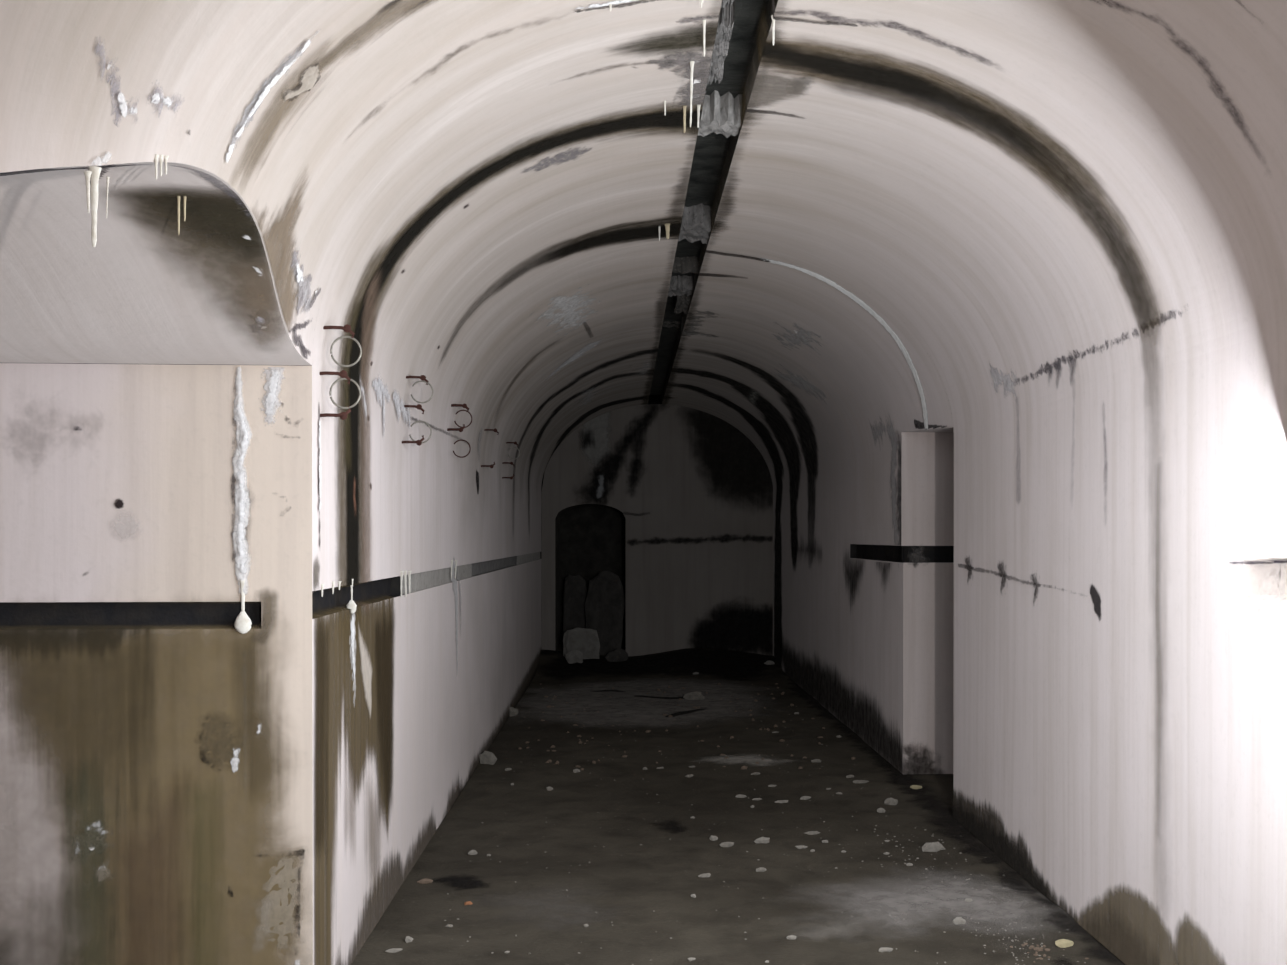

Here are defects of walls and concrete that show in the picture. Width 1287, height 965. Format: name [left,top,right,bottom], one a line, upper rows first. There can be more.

peeling [96,42,137,125]
peeling [152,87,181,114]
crack [773,9,986,61]
crack [1103,0,1243,129]
peeling [291,251,317,313]
damp [338,105,703,587]
crack [1018,311,1175,381]
damp [231,367,284,594]
damp [0,593,296,965]
damp [312,597,1225,965]
spalling [259,850,305,944]